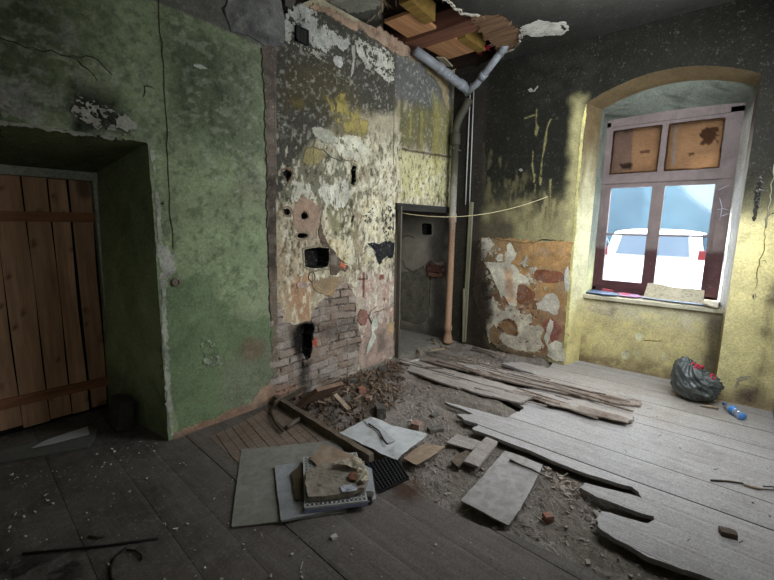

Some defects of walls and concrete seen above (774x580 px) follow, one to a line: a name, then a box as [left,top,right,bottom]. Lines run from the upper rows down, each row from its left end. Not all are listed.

crack [0,37,112,80]
flaking render [284,2,450,111]
peeling [0,95,138,142]
crack [143,0,174,249]
spalling [281,167,294,185]
peeling [312,127,370,209]
spalling [420,221,434,238]
flaking render [477,107,586,362]
crack [749,165,774,286]
flaking render [154,189,395,440]